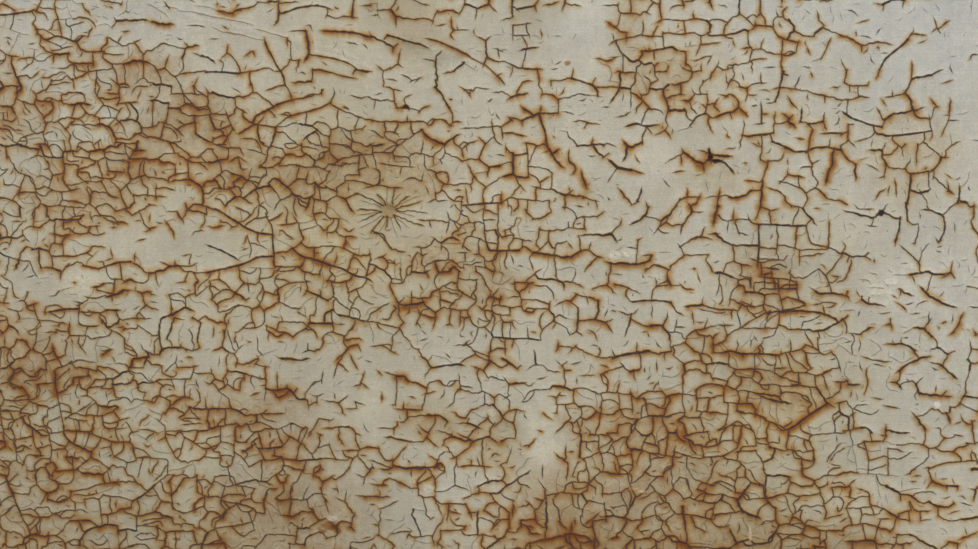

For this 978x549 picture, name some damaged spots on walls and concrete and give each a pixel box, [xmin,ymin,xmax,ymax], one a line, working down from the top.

crack [9,440,73,516]
crack [0,463,162,549]
crack [165,466,329,549]
crack [308,461,389,549]
crack [348,439,543,549]
crack [588,438,673,504]
crack [584,475,714,549]
crack [688,509,826,549]
crack [774,477,849,537]
crack [790,501,874,549]
crack [824,477,902,549]
crack [869,465,978,549]